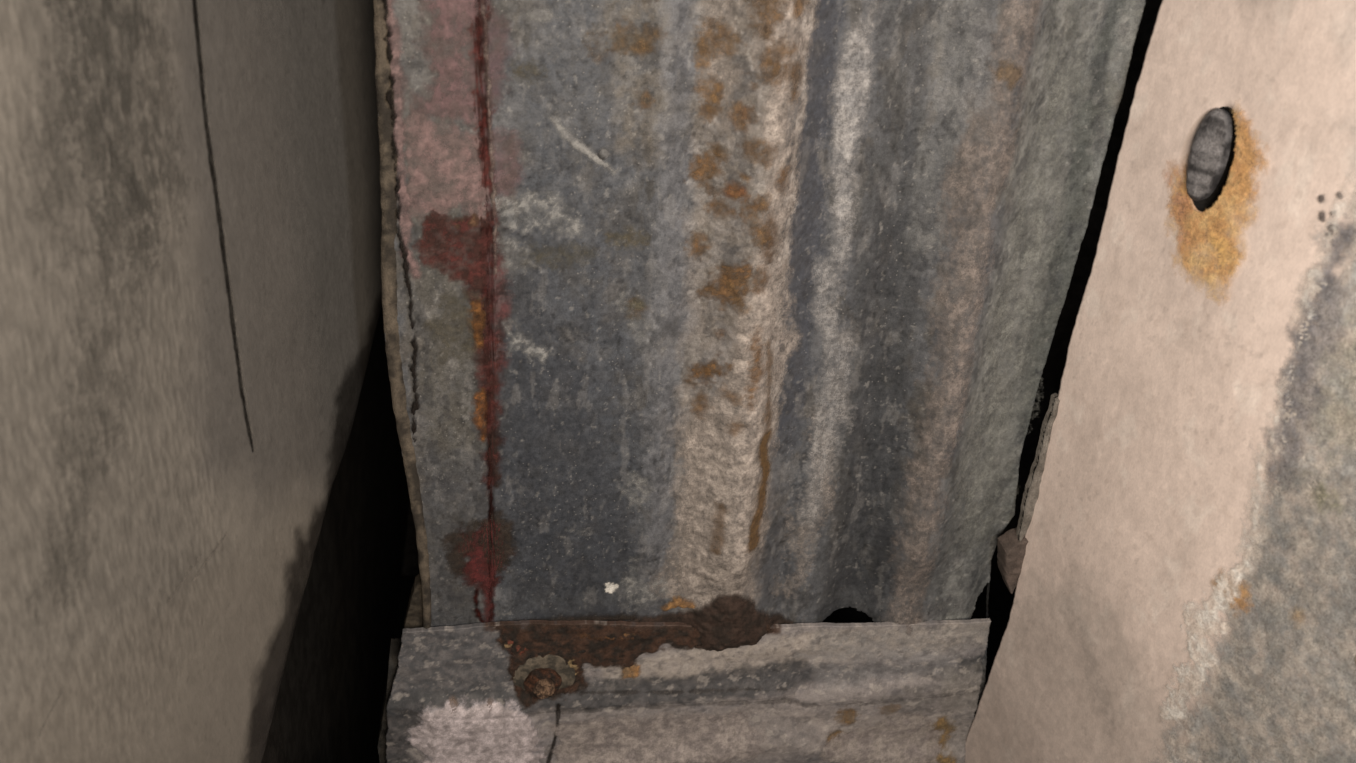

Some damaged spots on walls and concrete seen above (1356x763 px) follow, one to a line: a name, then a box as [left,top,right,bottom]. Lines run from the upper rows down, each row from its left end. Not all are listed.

leakage [83,0,171,215]
rust [697,19,776,164]
rust [754,0,807,98]
crack [193,0,254,452]
rust [373,0,431,629]
rust [416,0,509,487]
rust [690,361,731,378]
rust [692,145,777,307]
rust [748,338,771,551]
rust [1172,118,1264,298]
rust [444,511,703,708]
crack [547,689,782,763]